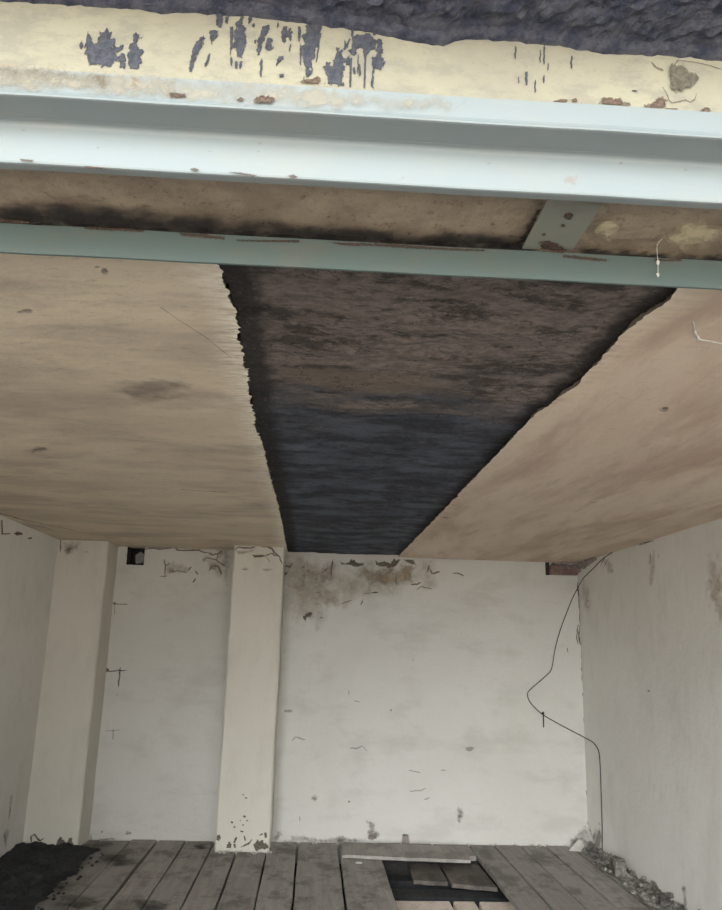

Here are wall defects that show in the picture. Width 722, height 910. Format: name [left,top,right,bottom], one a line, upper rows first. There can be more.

corrosion [599,97,630,105]
corrosion [644,96,678,110]
leakage [0,205,541,251]
corrosion [539,233,607,261]
crack [148,548,225,582]
flaking render [375,559,416,568]
flaking render [216,816,270,851]